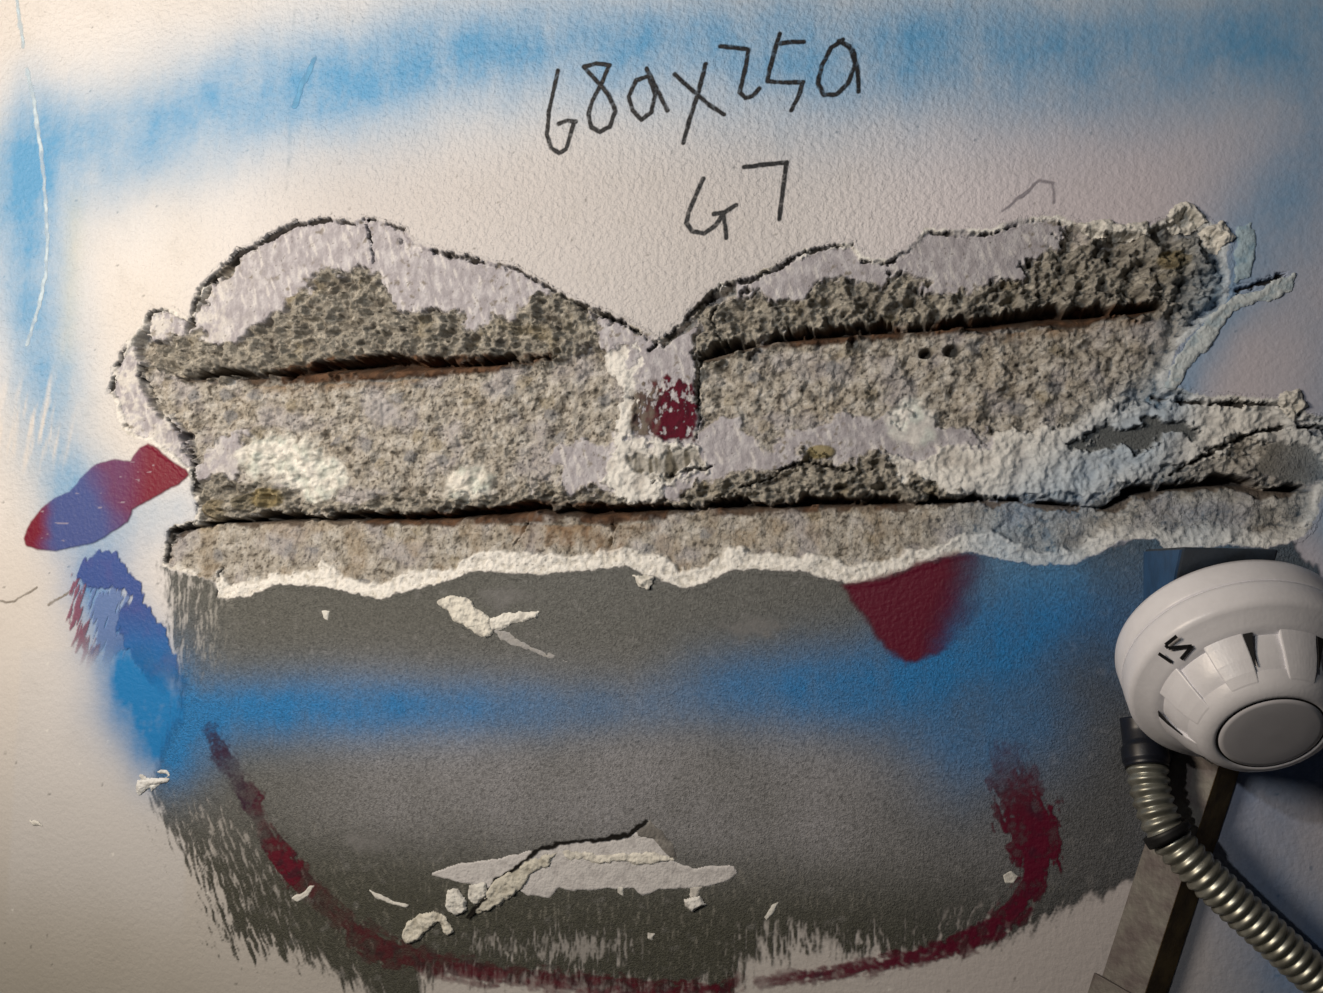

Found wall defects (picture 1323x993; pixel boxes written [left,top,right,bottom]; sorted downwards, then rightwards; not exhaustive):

spalling [105,209,1323,662]
peeling [369,819,737,944]